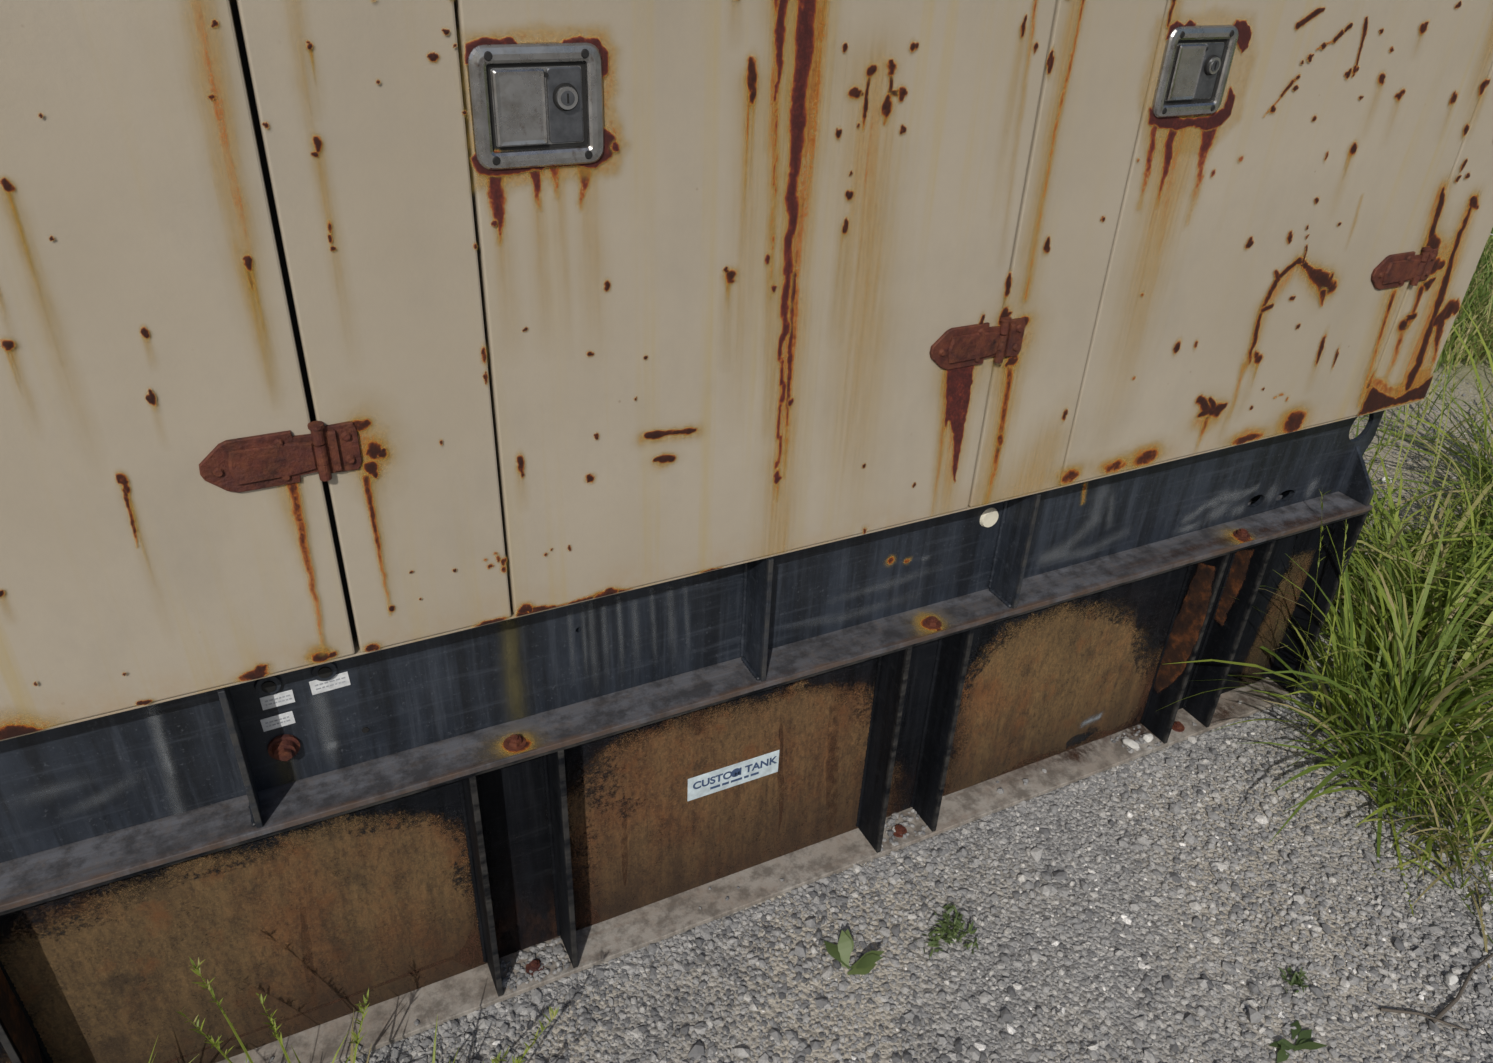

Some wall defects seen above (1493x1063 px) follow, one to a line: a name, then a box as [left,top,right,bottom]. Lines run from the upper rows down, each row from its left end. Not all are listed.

corrosion [1166,0,1196,40]
corrosion [1233,19,1252,53]
corrosion [0,177,22,234]
corrosion [427,29,620,242]
corrosion [744,0,908,507]
corrosion [935,365,975,492]
corrosion [979,0,1086,504]
corrosion [1137,86,1235,246]
corrosion [1315,334,1339,368]
corrosion [1358,158,1479,416]
corrosion [286,482,337,663]
corrosion [1153,528,1268,694]